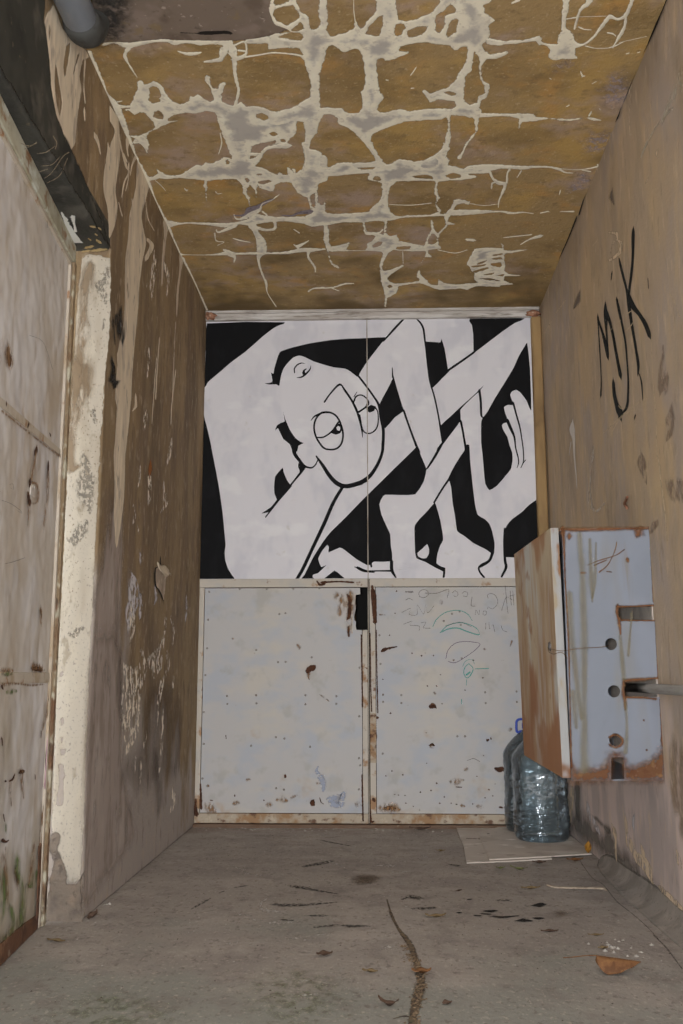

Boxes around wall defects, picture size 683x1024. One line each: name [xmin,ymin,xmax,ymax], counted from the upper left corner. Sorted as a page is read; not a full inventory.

flaking render [44,0,647,922]
rust [316,581,397,719]
rust [194,783,216,817]
rust [357,775,414,823]
flaking render [612,815,683,911]